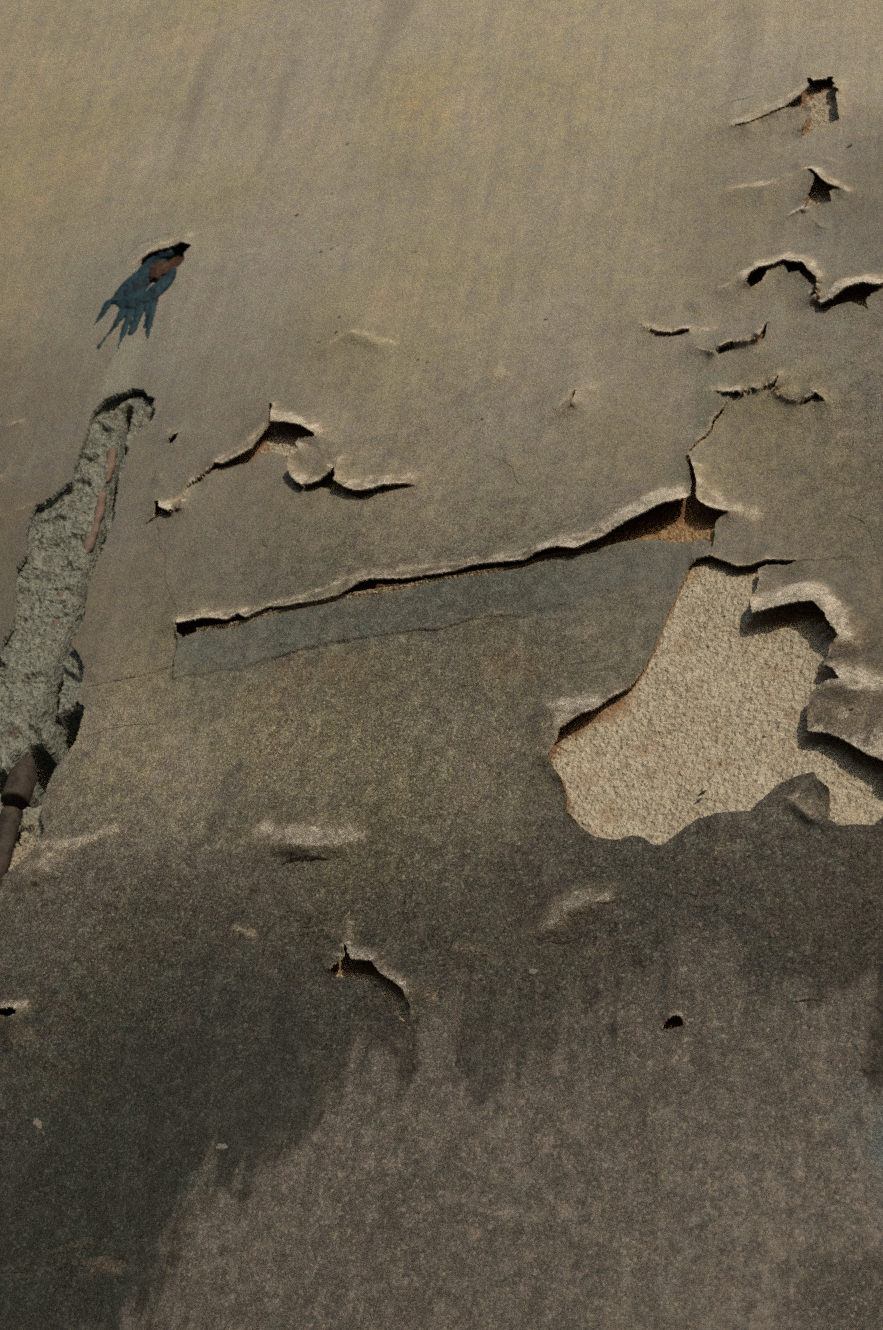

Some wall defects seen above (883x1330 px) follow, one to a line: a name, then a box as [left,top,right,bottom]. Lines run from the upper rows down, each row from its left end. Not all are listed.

peeling [126,227,207,272]
flaking render [626,57,883,424]
spalling [0,388,156,660]
flaking render [114,385,437,530]
crack [148,389,762,650]
flaking render [506,531,883,849]
flaking render [0,985,43,1018]